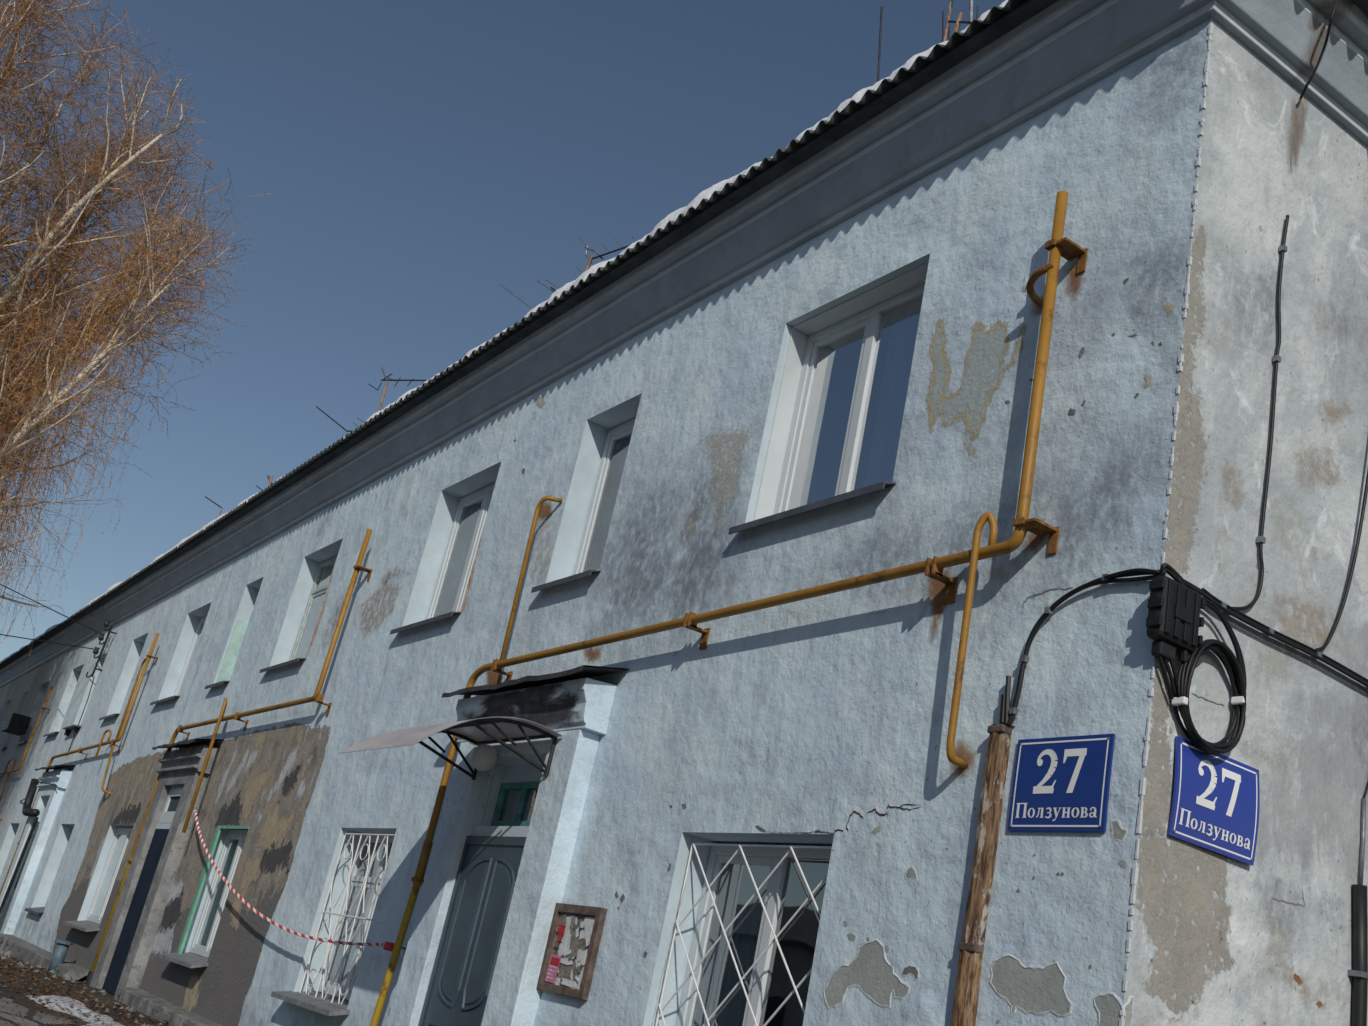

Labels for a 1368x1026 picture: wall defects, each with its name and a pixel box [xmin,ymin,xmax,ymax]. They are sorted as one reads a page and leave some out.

peeling [926,318,1026,455]
peeling [361,570,397,632]
rust [930,572,948,633]
damp [518,693,578,721]
flaking render [53,723,330,1026]
crack [756,800,921,834]
peeling [1093,666,1235,1026]
flaking render [823,921,920,1010]
flaking render [989,953,1074,1023]